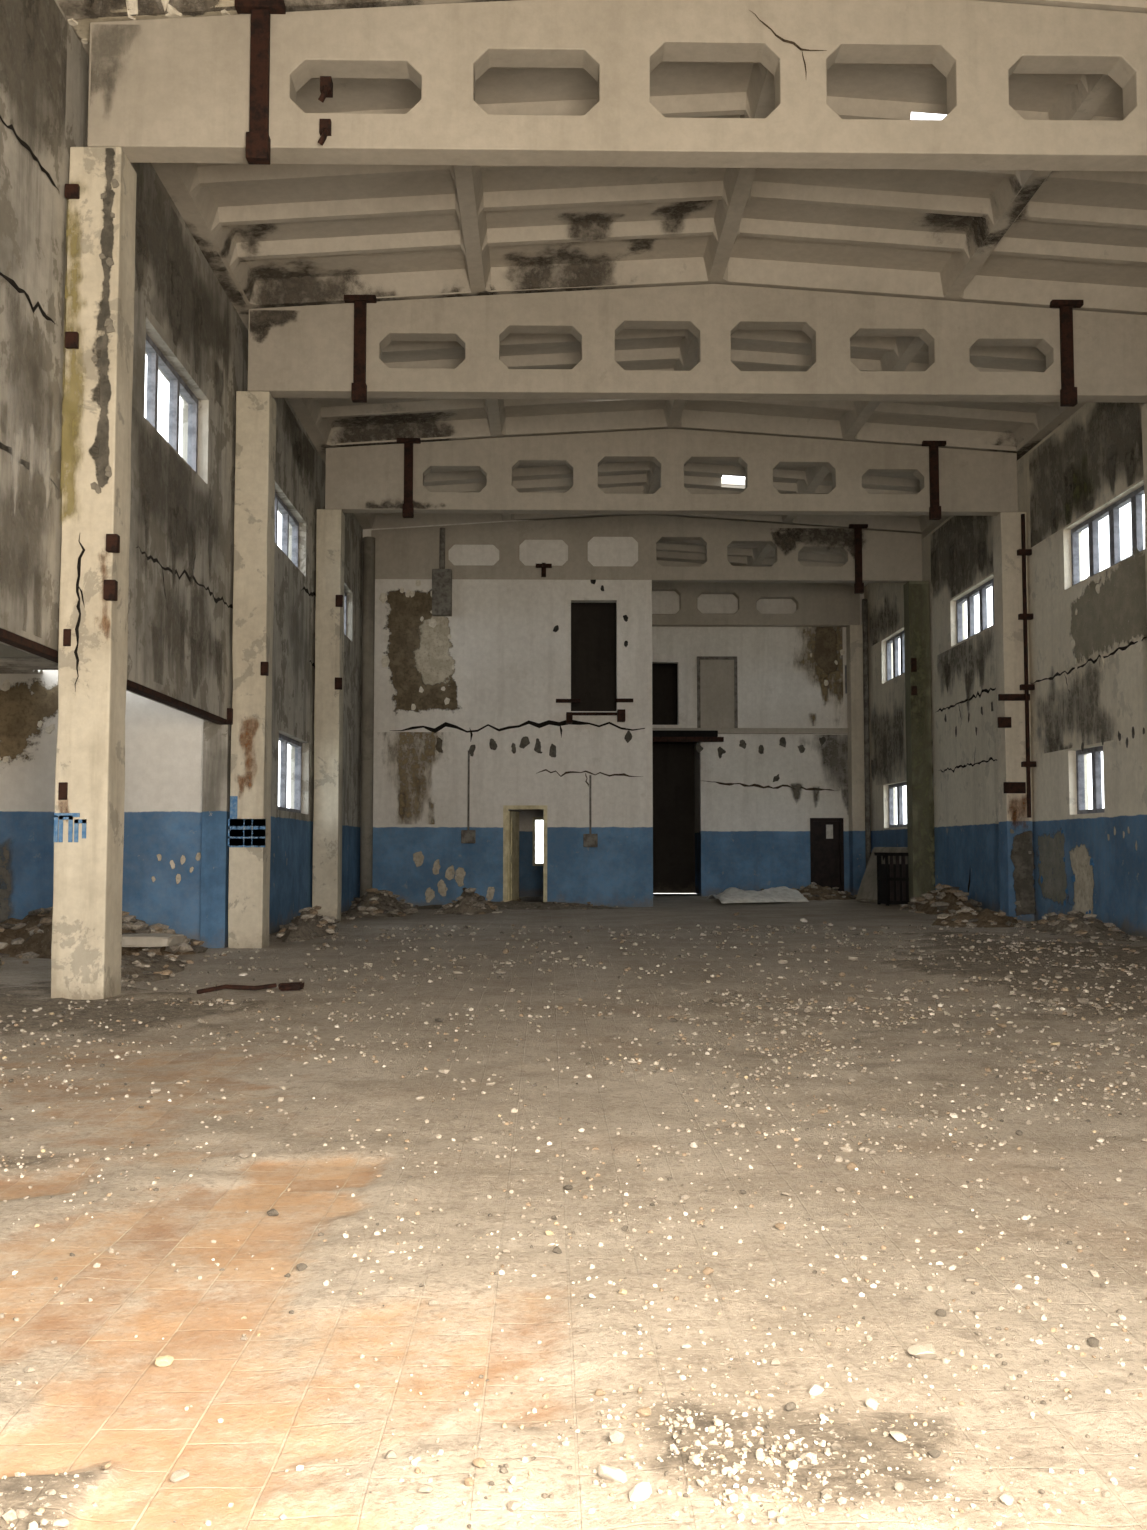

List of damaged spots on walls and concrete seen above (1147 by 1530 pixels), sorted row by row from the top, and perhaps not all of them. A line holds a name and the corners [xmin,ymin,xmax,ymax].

leakage [0,0,236,145]
leakage [284,0,414,12]
crack [751,11,827,73]
leakage [508,213,613,293]
crack [0,272,55,324]
crack [0,442,59,490]
leakage [995,402,1143,547]
spalling [379,580,459,714]
peeling [1071,548,1147,670]
spalling [0,678,58,763]
spalling [469,736,556,757]
crack [390,720,645,787]